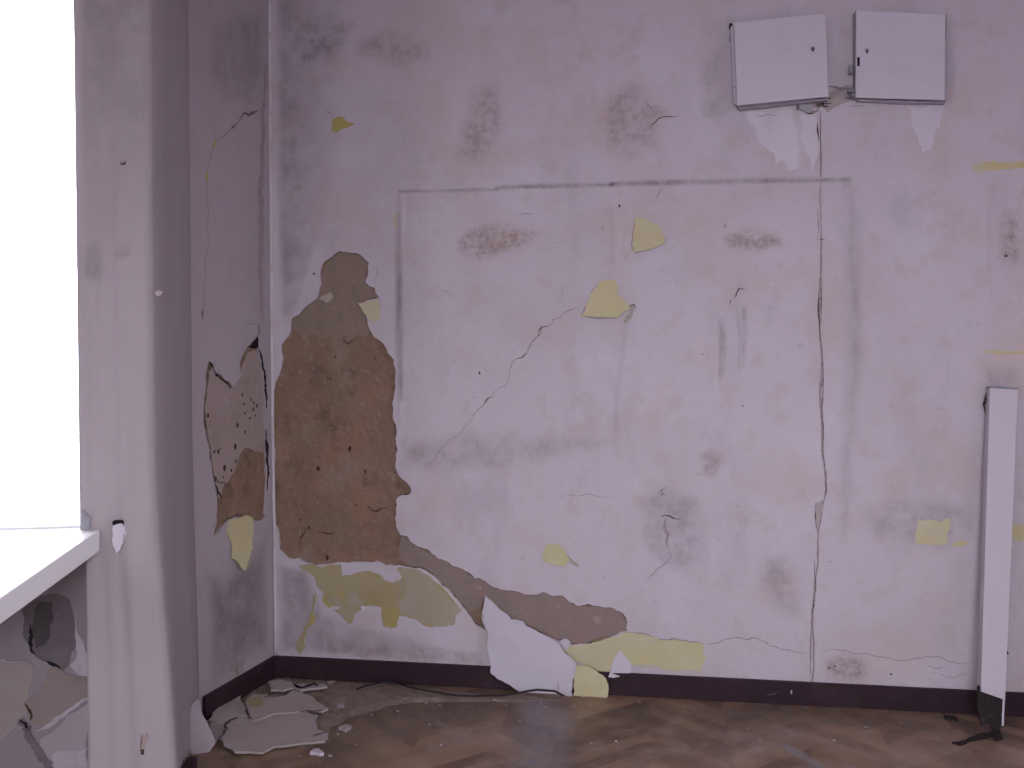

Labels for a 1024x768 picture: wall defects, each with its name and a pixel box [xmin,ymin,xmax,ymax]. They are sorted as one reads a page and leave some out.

crack [246,60,267,333]
peeling [326,110,355,133]
peeling [631,217,665,254]
spalling [796,98,831,114]
spalling [203,251,706,698]
crack [427,287,577,465]
crack [647,486,681,582]
crack [707,112,970,682]
peeling [914,518,969,547]
spalling [0,593,89,768]